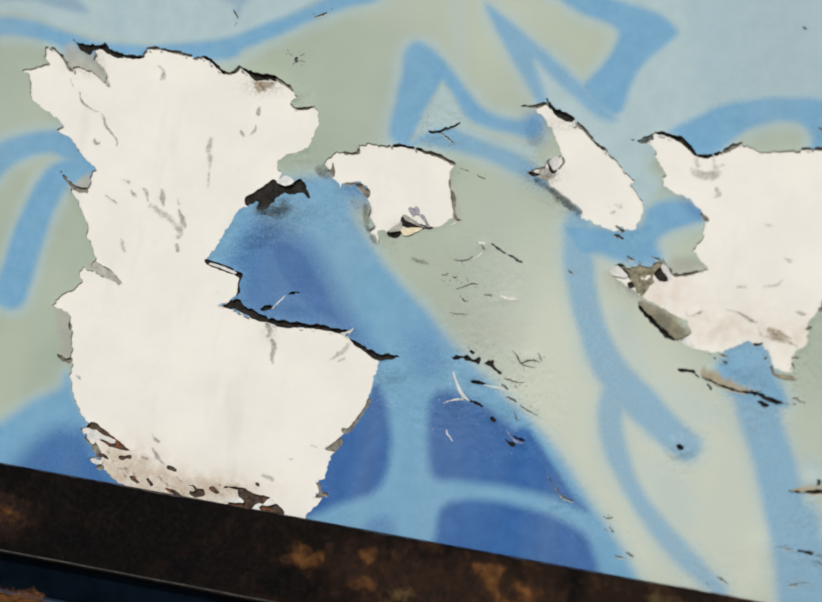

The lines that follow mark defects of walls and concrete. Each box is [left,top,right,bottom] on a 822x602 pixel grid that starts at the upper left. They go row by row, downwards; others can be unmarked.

peeling [23,40,399,518]
peeling [324,143,462,245]
peeling [521,98,643,240]
peeling [609,131,822,380]
corrosion [166,482,285,514]